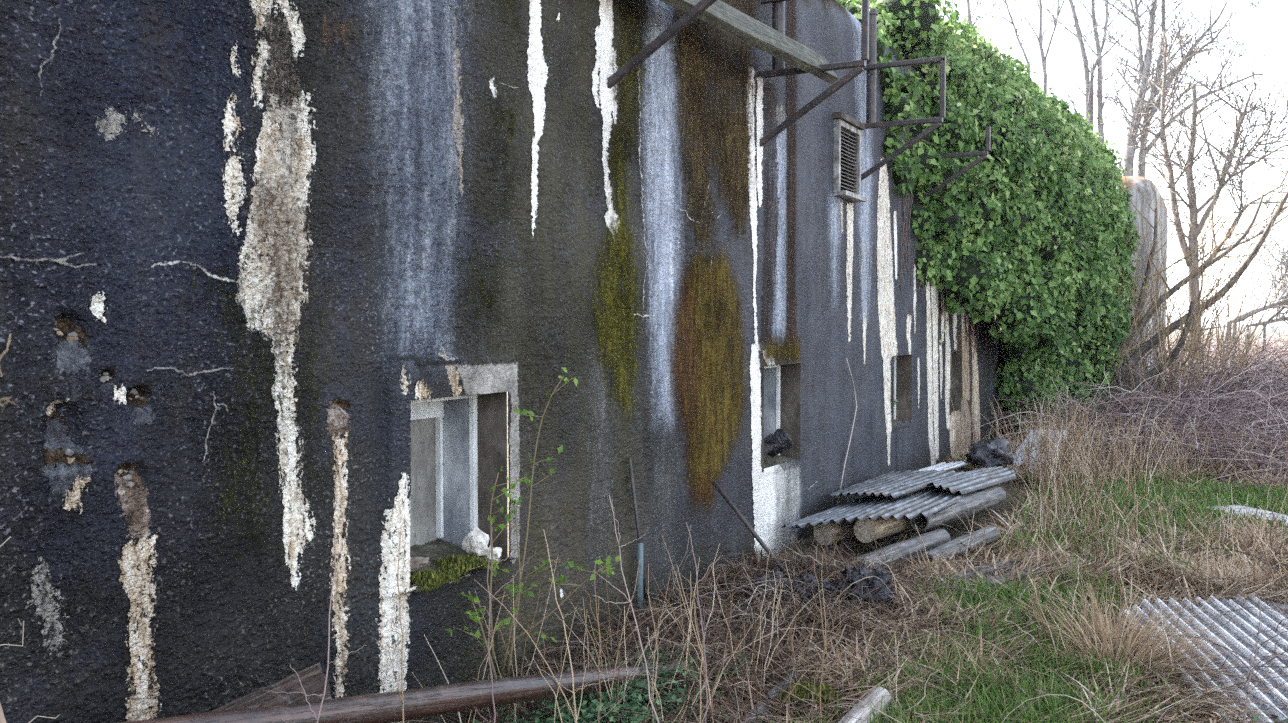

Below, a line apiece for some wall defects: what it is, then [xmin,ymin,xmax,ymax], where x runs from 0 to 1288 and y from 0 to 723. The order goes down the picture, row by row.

spalling [51,291,154,426]
peeling [221,0,318,591]
water stain [379,0,463,359]
peeling [527,0,562,236]
peeling [592,0,620,240]
peeling [840,158,981,466]
peeling [114,461,162,721]
peeling [326,398,351,698]
peeling [375,472,416,693]